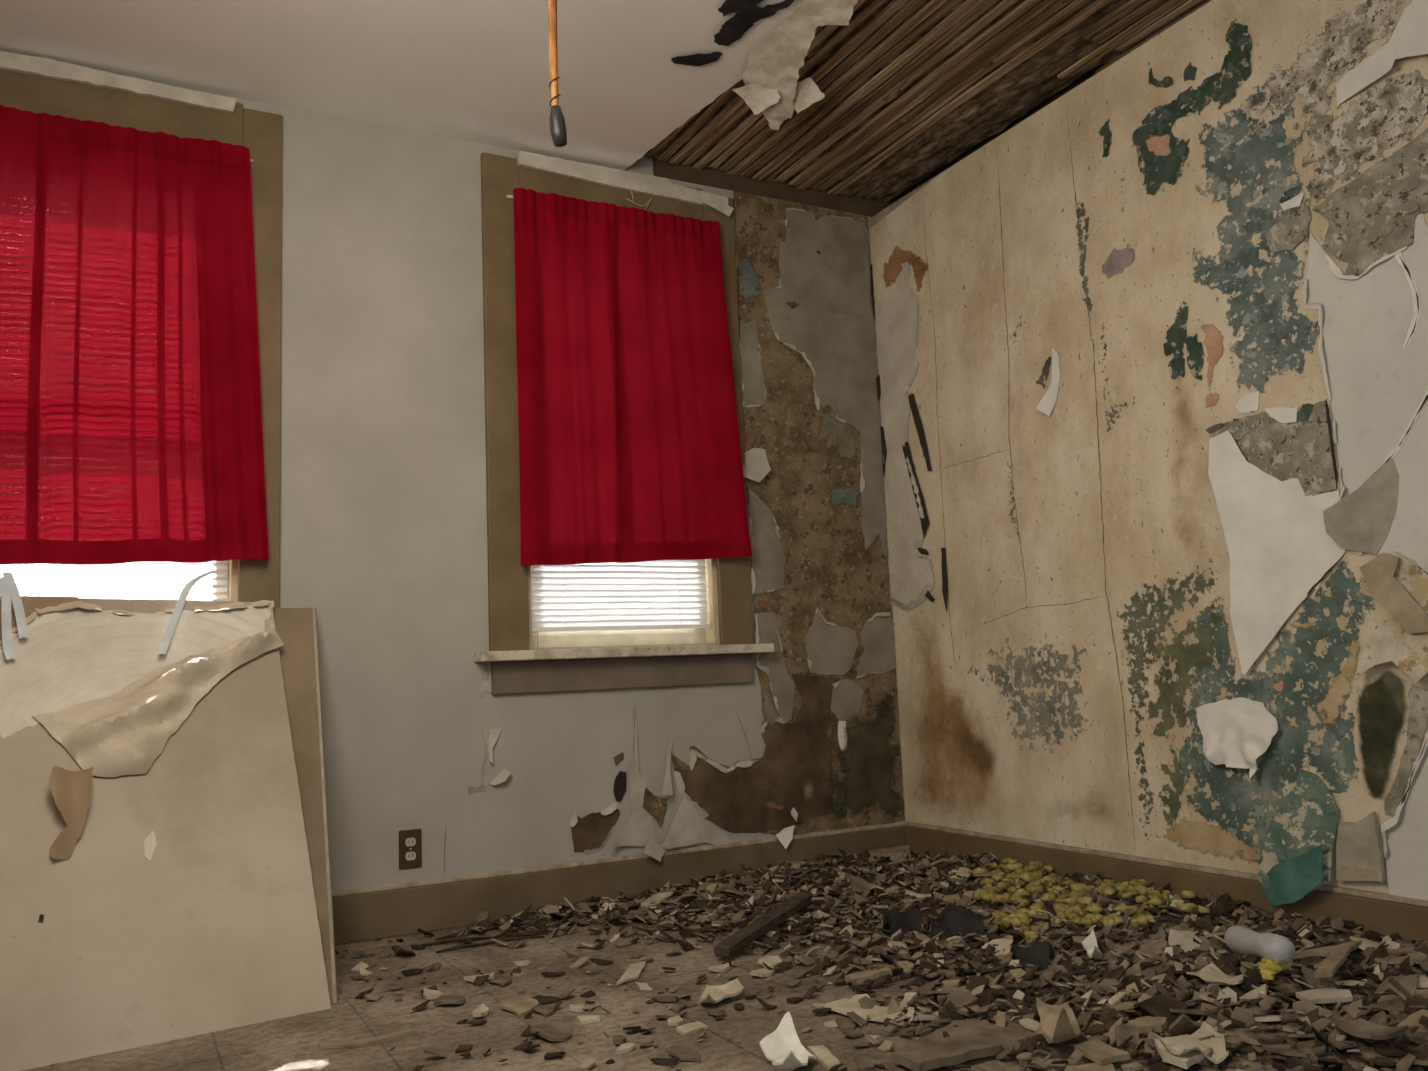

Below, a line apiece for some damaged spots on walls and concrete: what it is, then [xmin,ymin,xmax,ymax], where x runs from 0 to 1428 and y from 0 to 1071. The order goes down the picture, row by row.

crack [1395,252,1421,349]
peeling [569,0,1428,906]
crack [1382,391,1428,465]
leakage [674,609,1126,849]